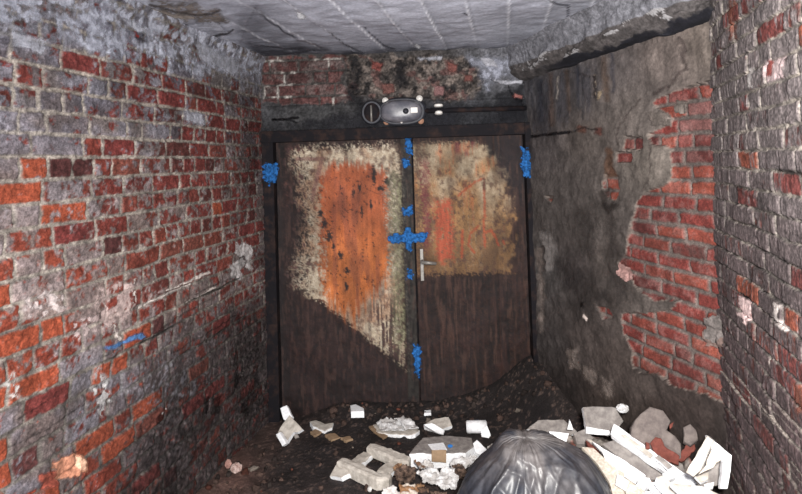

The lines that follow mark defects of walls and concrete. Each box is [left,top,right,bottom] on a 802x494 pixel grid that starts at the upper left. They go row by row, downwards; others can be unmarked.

damp [230,242,253,280]
flaking render [595,80,726,406]
damp [25,290,64,319]
damp [74,271,210,341]
damp [93,372,110,415]